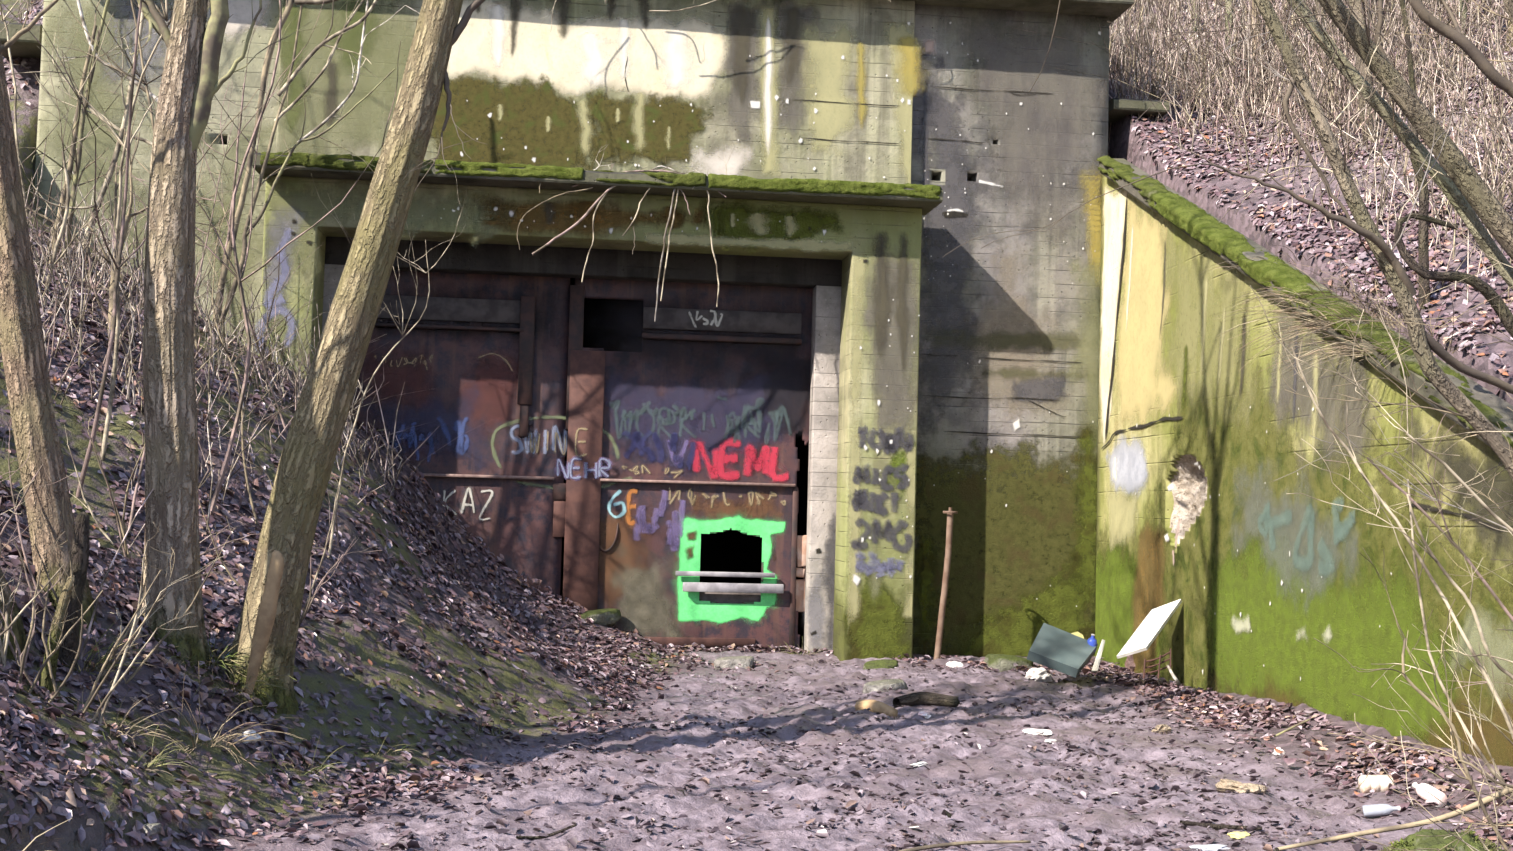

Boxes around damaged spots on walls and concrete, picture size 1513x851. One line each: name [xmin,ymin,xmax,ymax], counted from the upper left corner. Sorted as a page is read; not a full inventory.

leakage [447,0,866,176]
leakage [646,18,1245,601]
leakage [1271,311,1368,458]
rust [598,515,648,604]
rust [694,495,779,519]
leakage [807,428,879,649]
leakage [905,531,936,636]
spalling [1164,454,1207,565]
leakage [1433,439,1513,553]
leakage [1459,613,1513,684]